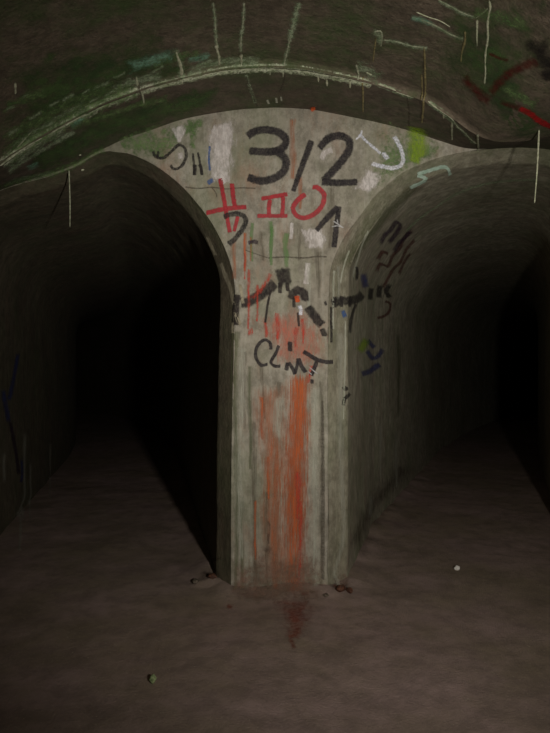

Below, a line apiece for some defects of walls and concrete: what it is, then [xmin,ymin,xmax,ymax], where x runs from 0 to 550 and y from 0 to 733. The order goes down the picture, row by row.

rust [254,377,308,590]